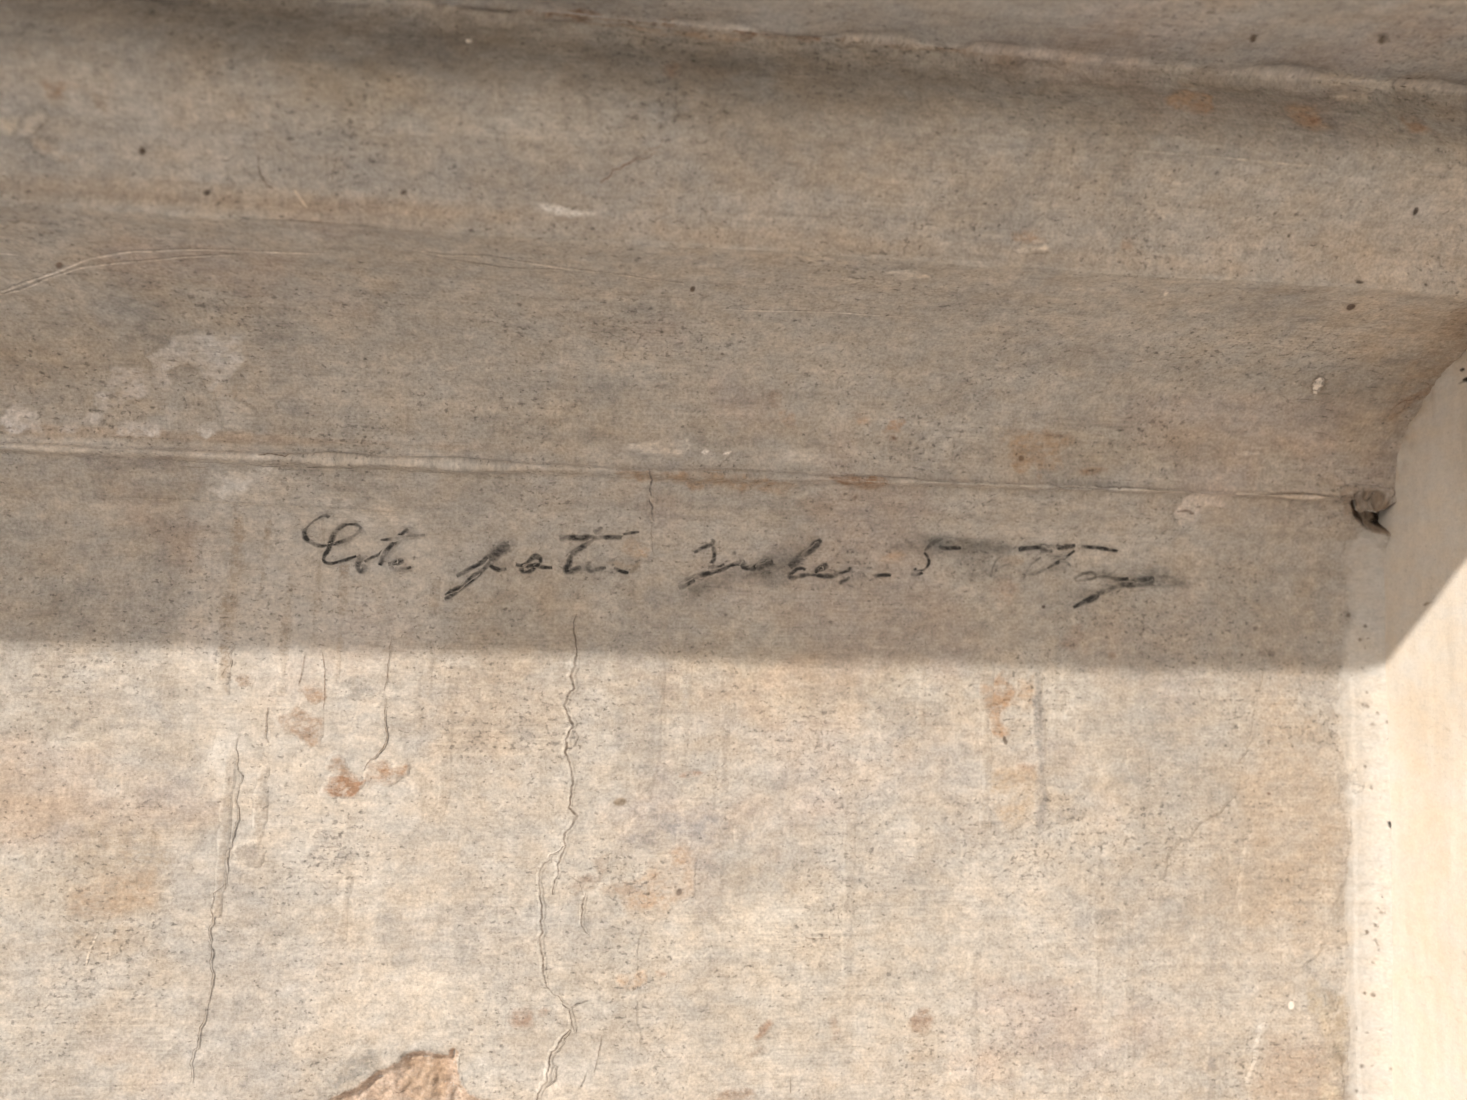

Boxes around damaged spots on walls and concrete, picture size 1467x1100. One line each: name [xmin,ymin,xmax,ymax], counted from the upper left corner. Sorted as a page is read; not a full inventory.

spalling [326,1046,495,1100]
crack [532,614,602,1100]